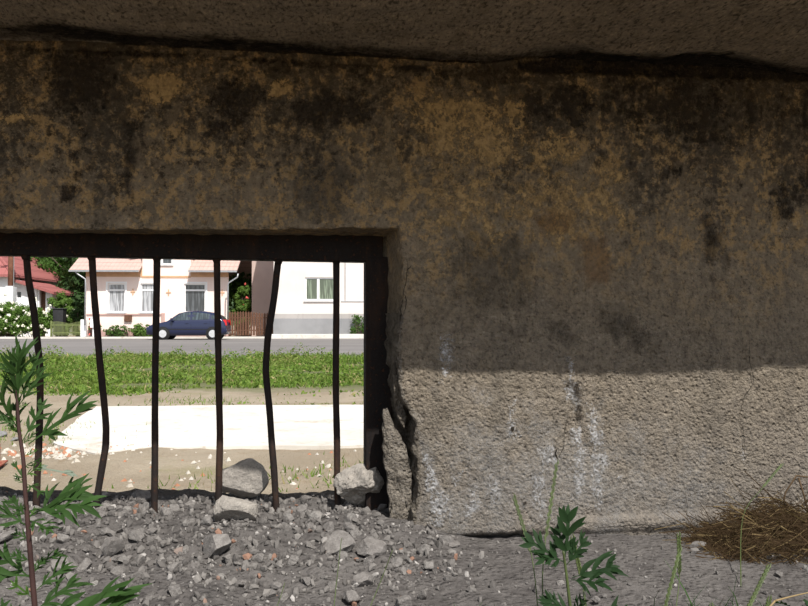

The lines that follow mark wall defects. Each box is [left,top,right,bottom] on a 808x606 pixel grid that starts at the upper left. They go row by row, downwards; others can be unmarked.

damp [44,52,117,203]
damp [198,71,267,147]
crack [2,25,498,71]
damp [247,41,808,154]
crack [517,52,808,82]
damp [769,172,808,224]
damp [565,363,606,507]